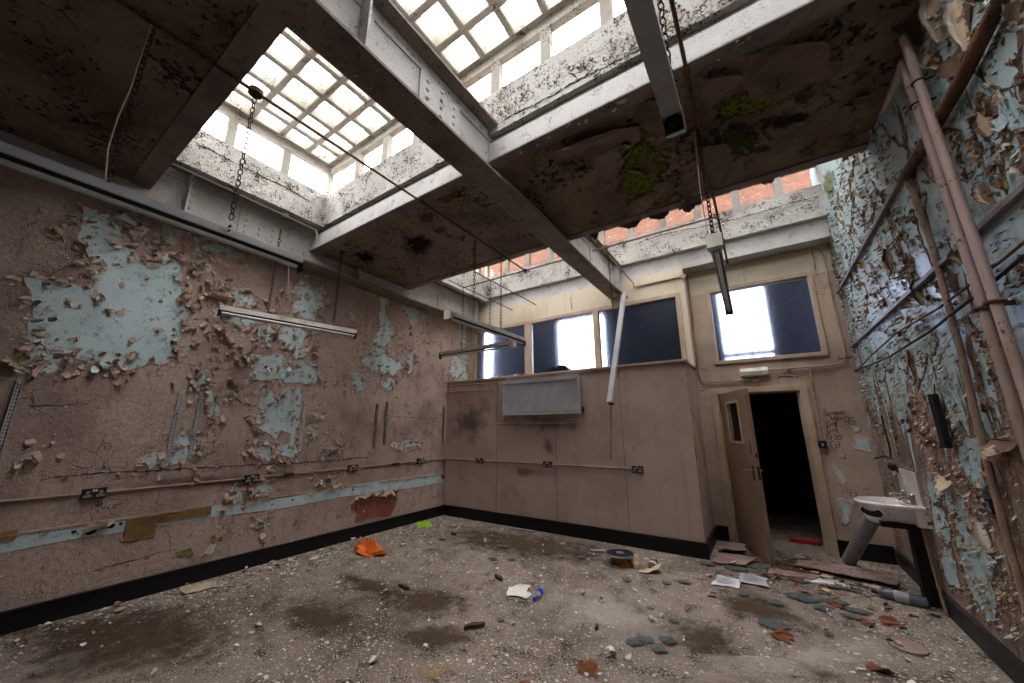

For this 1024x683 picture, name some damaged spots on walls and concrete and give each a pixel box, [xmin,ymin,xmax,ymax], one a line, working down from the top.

peeling [566,31,637,79]
peeling [481,78,558,131]
peeling [537,127,641,160]
water stain [757,113,811,129]
peeling [884,0,1024,355]
peeling [0,201,472,564]
peeling [616,84,1024,648]